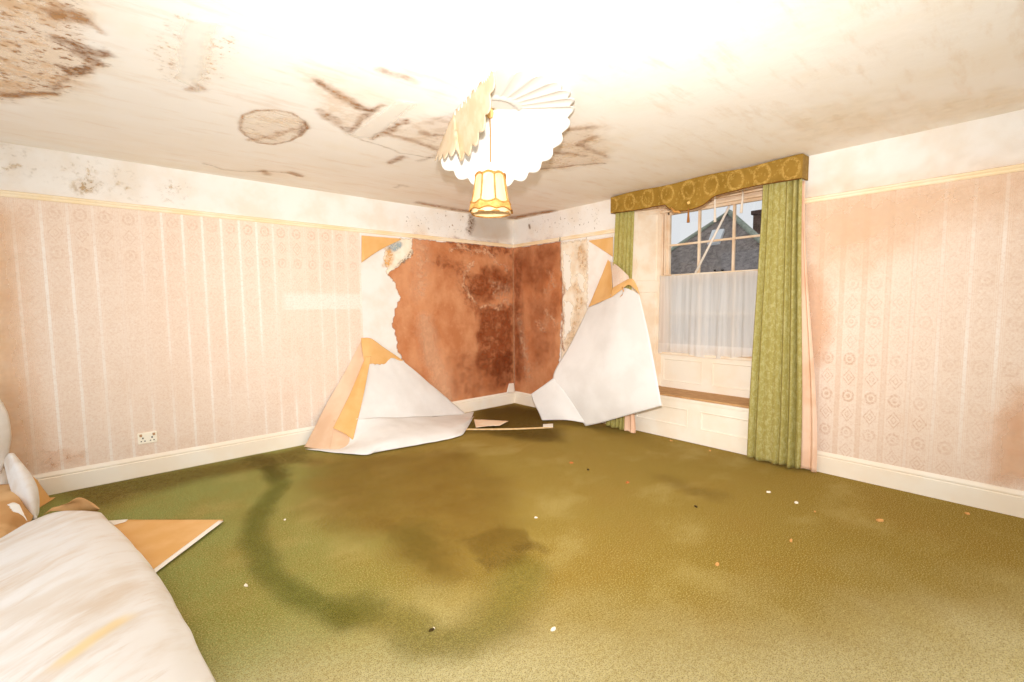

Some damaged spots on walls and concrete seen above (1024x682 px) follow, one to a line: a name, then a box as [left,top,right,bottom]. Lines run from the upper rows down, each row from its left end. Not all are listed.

damp [0,0,110,99]
damp [316,81,378,131]
damp [422,203,530,384]
flaking render [383,236,613,402]